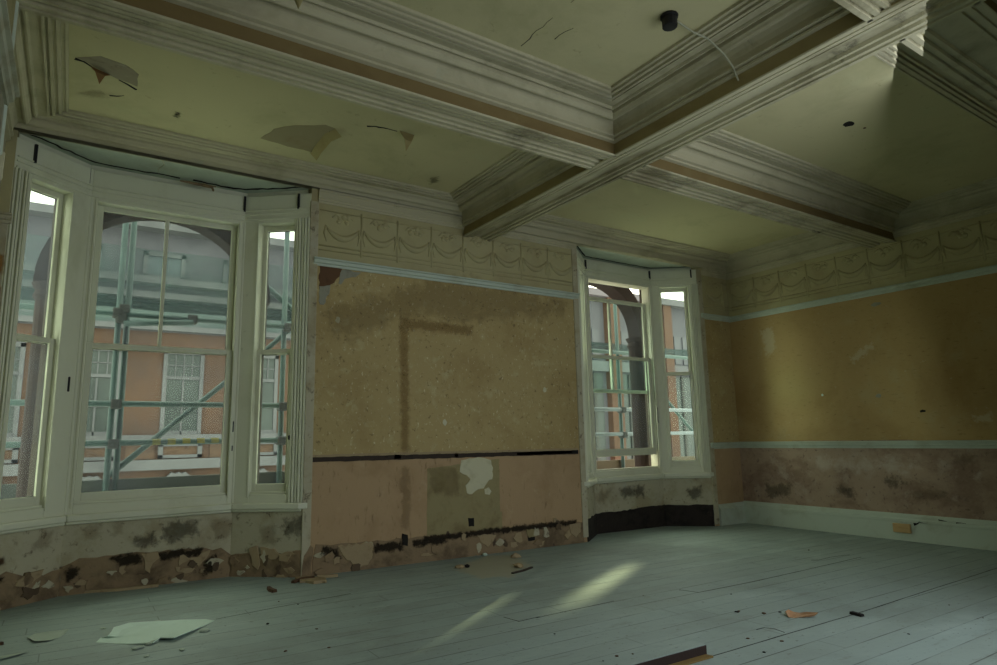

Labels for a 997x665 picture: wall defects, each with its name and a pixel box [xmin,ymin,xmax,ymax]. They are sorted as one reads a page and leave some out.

peeling [318,266,361,305]
water stain [793,440,950,495]
peeling [446,520,571,553]
water stain [110,553,142,566]
water stain [158,547,217,574]
peeling [171,550,224,583]
peeling [313,542,373,571]
peeling [14,572,86,600]